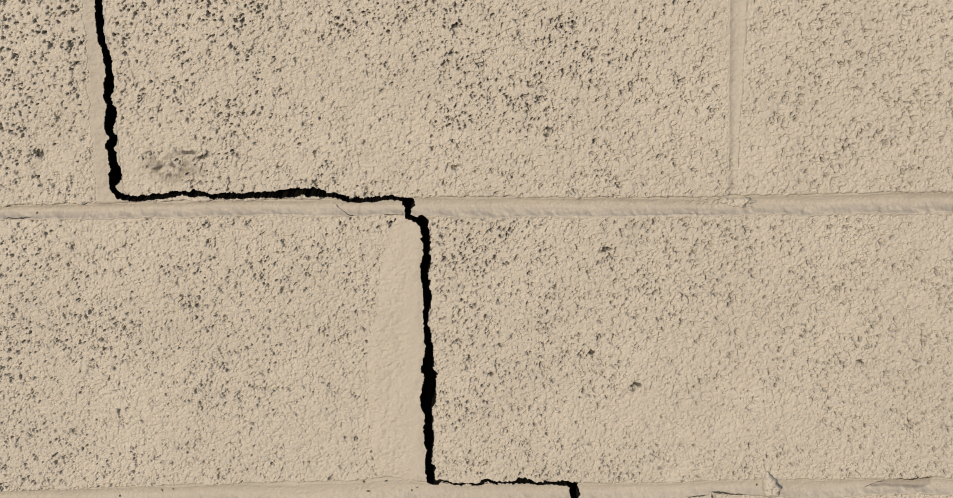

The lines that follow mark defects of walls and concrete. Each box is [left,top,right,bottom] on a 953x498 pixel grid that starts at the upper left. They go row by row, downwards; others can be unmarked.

crack [94,0,580,498]